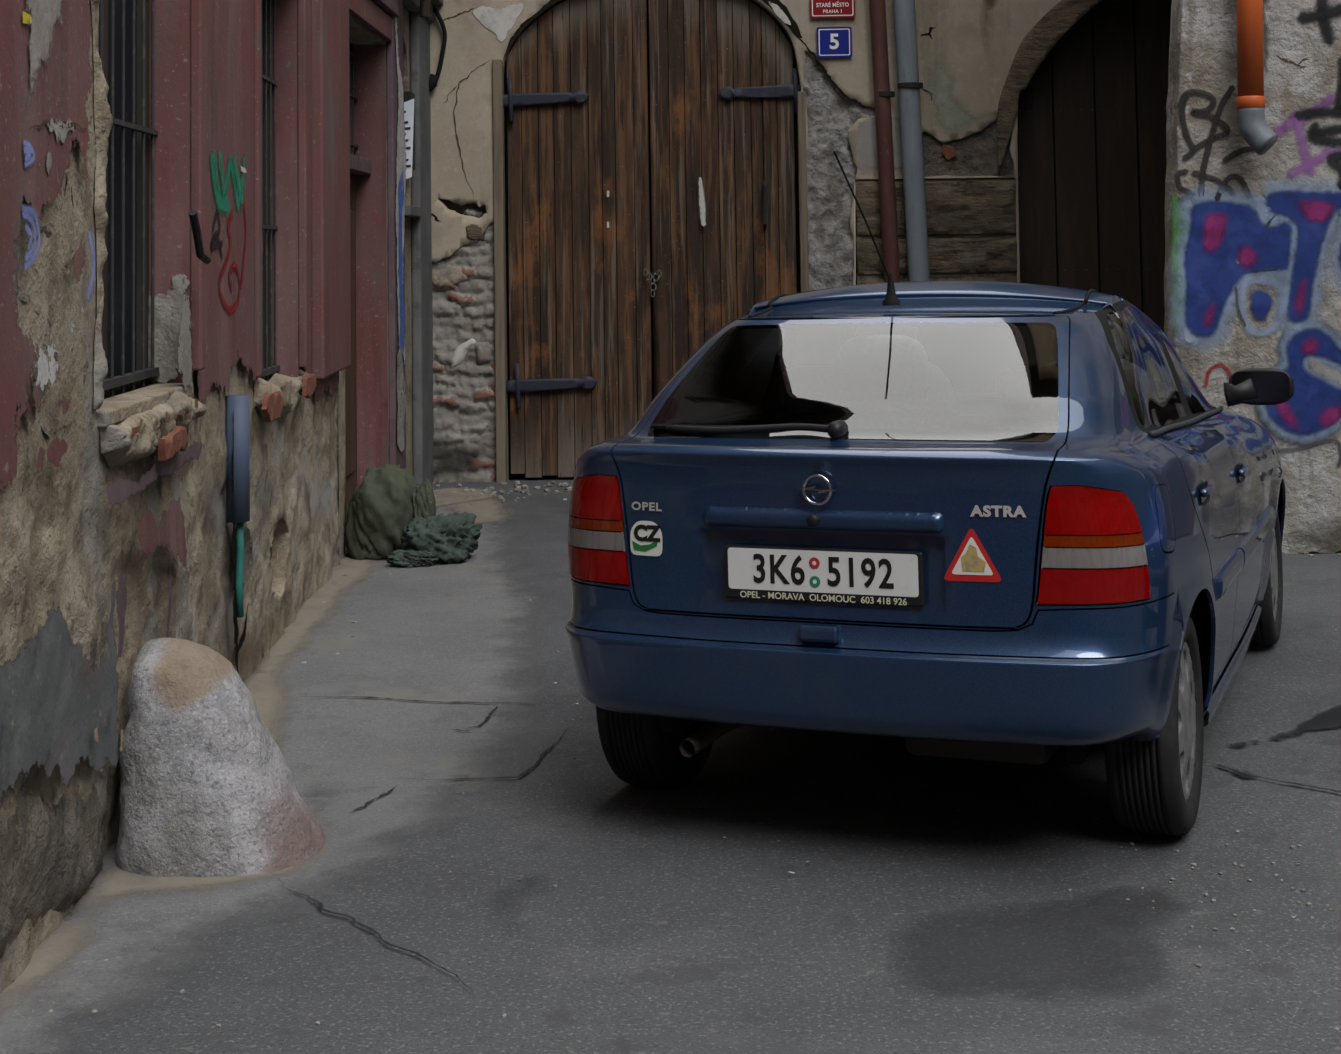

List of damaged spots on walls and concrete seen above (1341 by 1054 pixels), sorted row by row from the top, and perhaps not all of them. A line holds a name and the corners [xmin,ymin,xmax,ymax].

spalling [17,0,113,472]
crack [446,0,555,191]
crack [762,0,874,109]
flaking render [803,51,875,291]
flaking render [132,272,200,461]
flaking render [261,391,284,422]
flaking render [432,199,496,483]
peeling [116,570,127,657]
peeling [135,497,187,638]
flaking render [231,522,253,590]